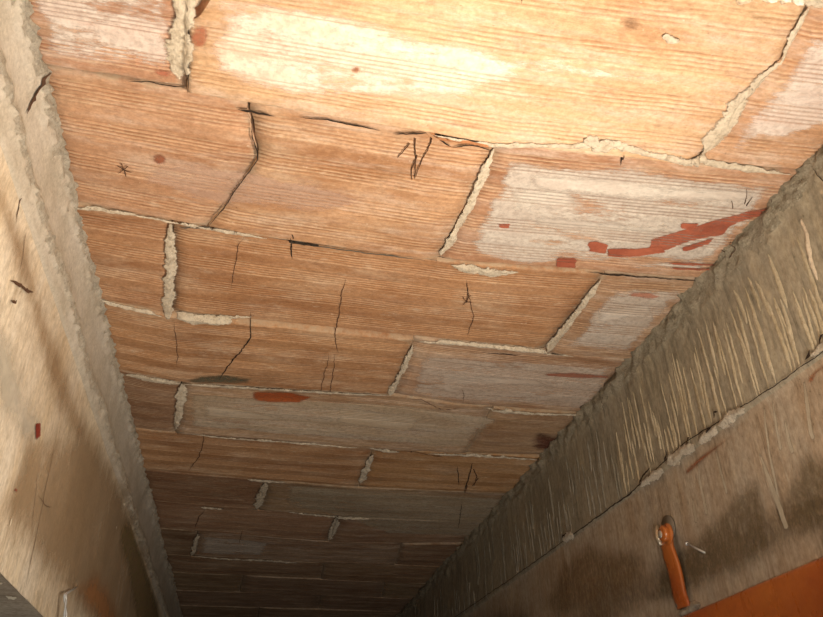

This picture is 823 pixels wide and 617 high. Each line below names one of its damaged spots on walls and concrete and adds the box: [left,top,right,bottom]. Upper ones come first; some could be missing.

spalling [194,0,210,18]
peeling [192,28,207,46]
efflorescence [214,2,524,98]
efflorescence [537,60,618,77]
crack [27,73,51,114]
efflorescence [741,40,823,142]
crack [303,117,492,151]
crack [180,109,272,230]
efflorescence [475,163,764,268]
crack [268,235,421,260]
crack [590,272,695,281]
leakage [414,219,823,617]